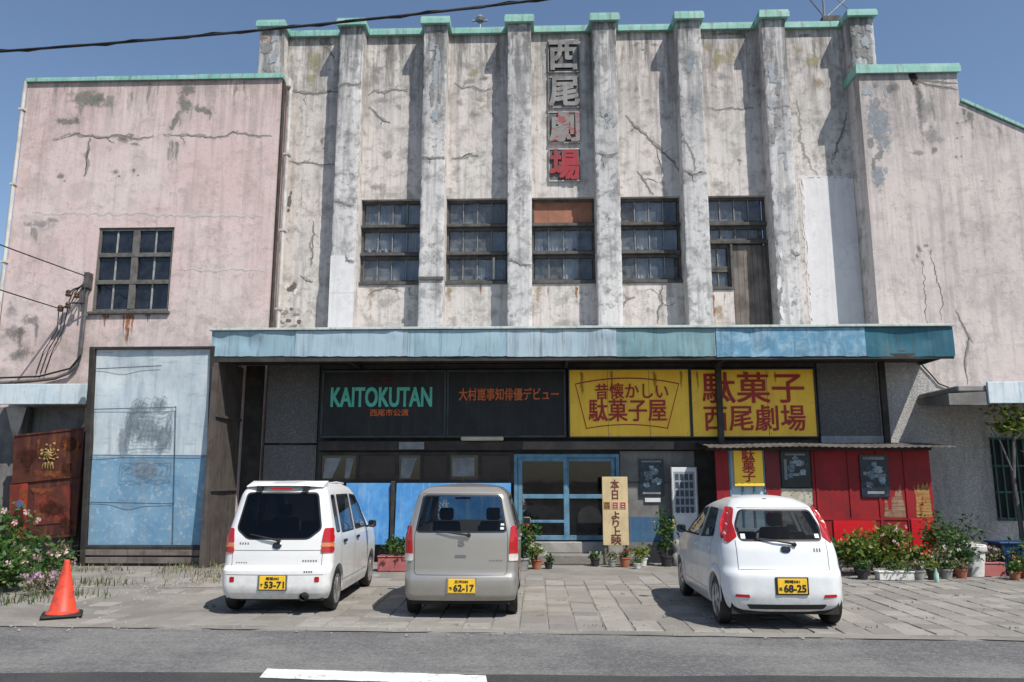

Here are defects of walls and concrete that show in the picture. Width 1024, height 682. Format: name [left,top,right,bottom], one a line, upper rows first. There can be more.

peeling [851,24,874,65]
crack [57,130,270,176]
crack [294,82,407,124]
crack [627,117,707,194]
crack [710,84,848,175]
peeling [862,81,893,173]
rust [122,314,150,339]
crack [955,309,973,383]
rust [13,440,64,525]